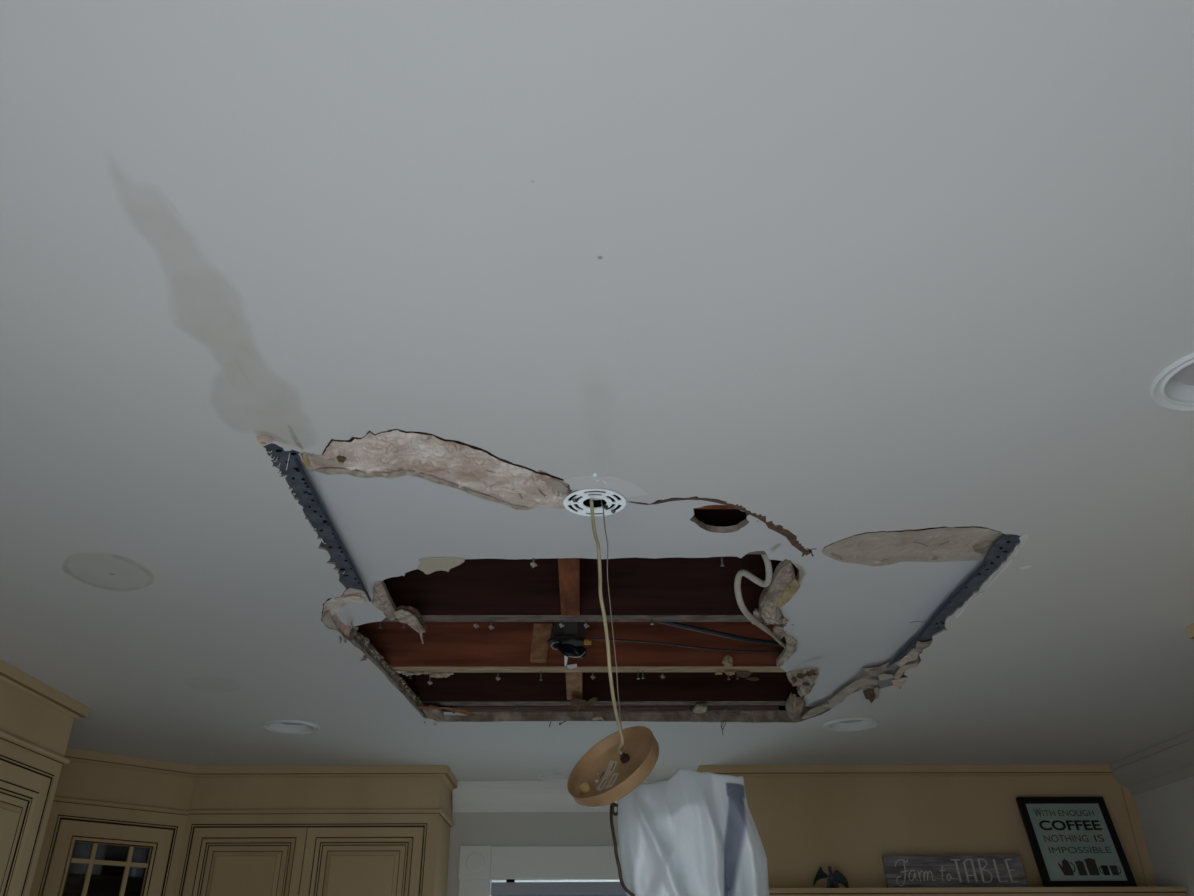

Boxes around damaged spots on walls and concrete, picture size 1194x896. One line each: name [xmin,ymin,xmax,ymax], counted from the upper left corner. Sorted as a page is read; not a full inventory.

spalling [298,429,572,511]
crack [631,496,814,557]
spalling [822,526,1003,567]
spalling [322,582,370,636]